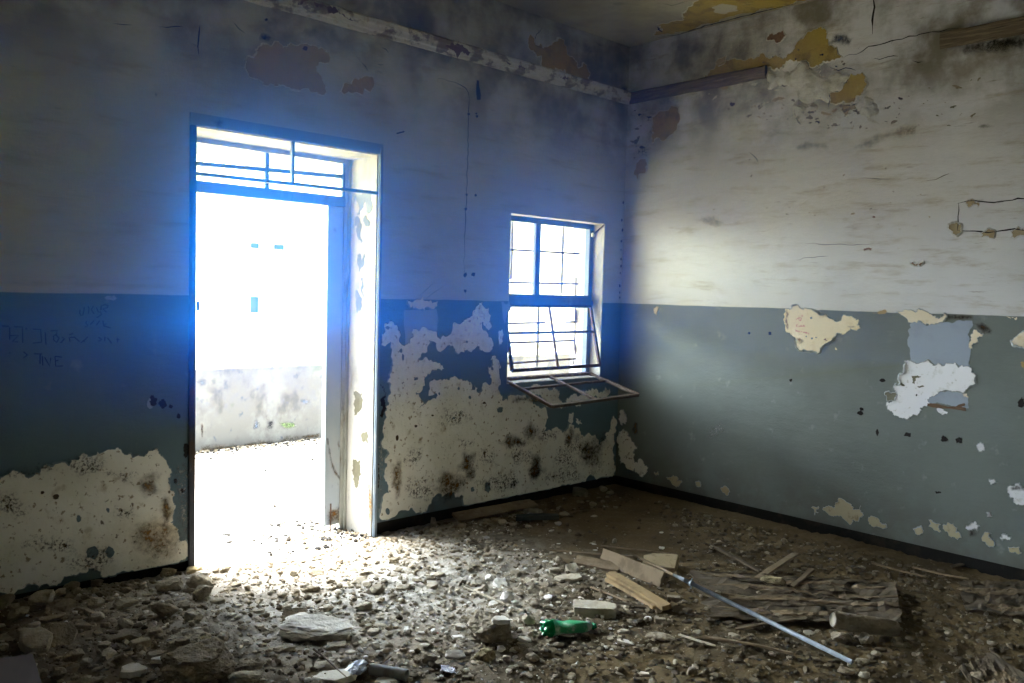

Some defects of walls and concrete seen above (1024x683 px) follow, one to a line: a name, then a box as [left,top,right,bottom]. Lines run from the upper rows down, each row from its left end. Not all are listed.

peeling [244,41,374,96]
peeling [704,26,910,131]
crack [957,198,1024,233]
peeling [783,304,861,355]
peeling [877,308,948,325]
peeling [968,329,984,350]
peeling [353,391,363,415]
flaking render [361,302,701,521]
peeling [879,359,977,437]
peeling [352,459,361,488]
flaking render [0,443,188,594]
peeling [811,498,887,529]